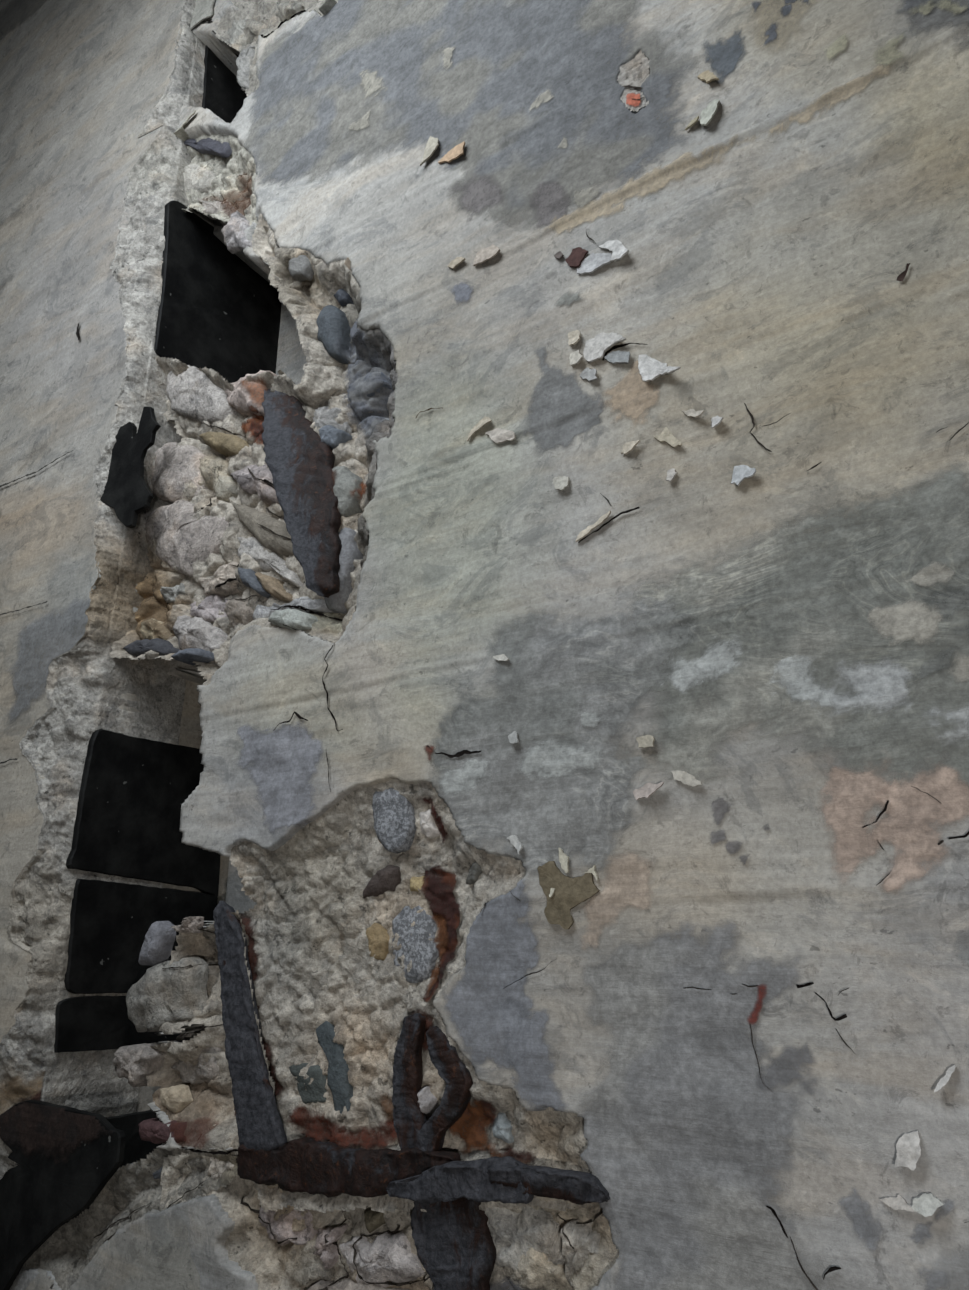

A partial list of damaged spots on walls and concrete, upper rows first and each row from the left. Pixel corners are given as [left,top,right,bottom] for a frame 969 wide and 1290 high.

peeling [420,136,466,166]
leakage [246,0,814,233]
peeling [554,240,629,275]
leakage [524,348,658,450]
spalling [0,0,434,1290]
crack [273,643,343,792]
leakage [433,470,969,1111]
spalling [229,779,600,1174]
corrosion [748,985,766,1024]
leakage [580,924,819,1290]
spalling [479,1195,619,1290]
crack [766,1205,841,1290]